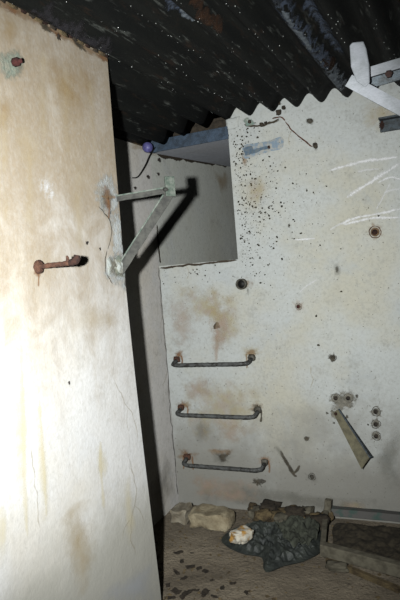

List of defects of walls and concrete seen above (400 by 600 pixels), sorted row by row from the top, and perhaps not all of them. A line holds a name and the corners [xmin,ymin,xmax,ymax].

leakage [233,122,313,286]